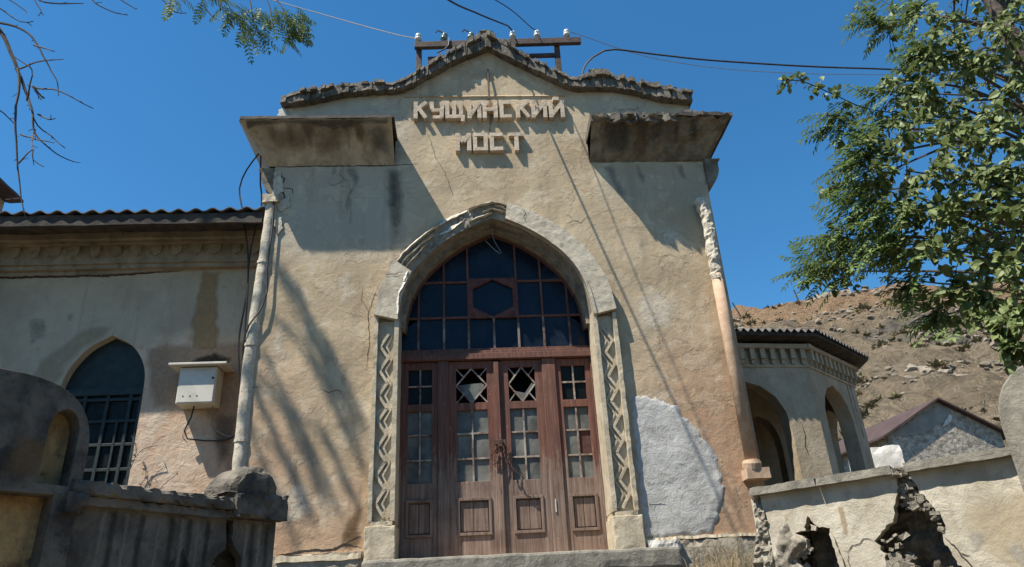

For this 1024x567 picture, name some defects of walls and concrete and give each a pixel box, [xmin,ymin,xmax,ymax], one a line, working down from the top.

spalling [752,497,775,567]
spalling [810,524,845,567]
spalling [881,532,921,567]
spalling [897,478,946,533]